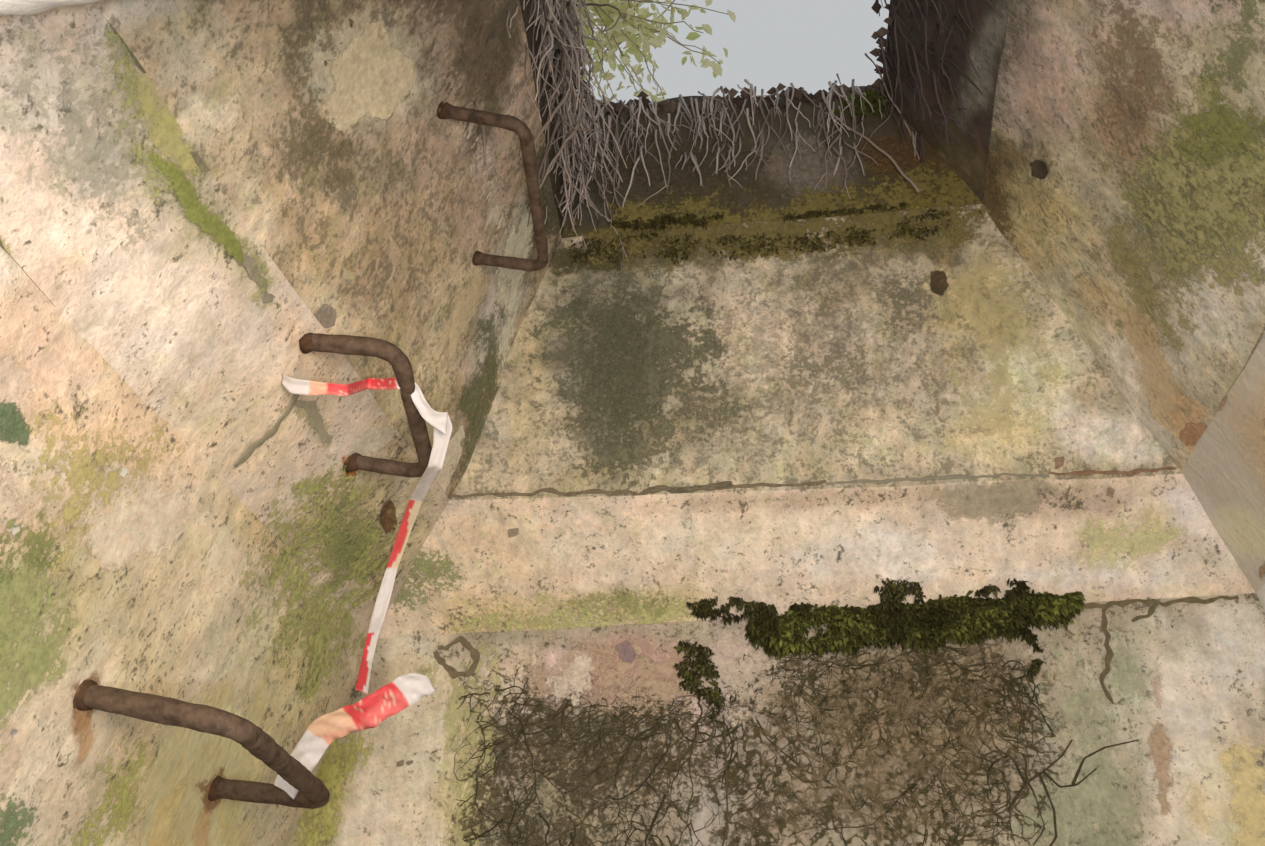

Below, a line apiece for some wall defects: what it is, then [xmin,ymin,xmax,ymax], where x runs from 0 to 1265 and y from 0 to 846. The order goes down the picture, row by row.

water stain [521,136,752,496]
crack [1219,329,1265,406]
crack [1083,565,1265,704]
corrosion [72,676,100,762]
corrosion [193,767,224,846]